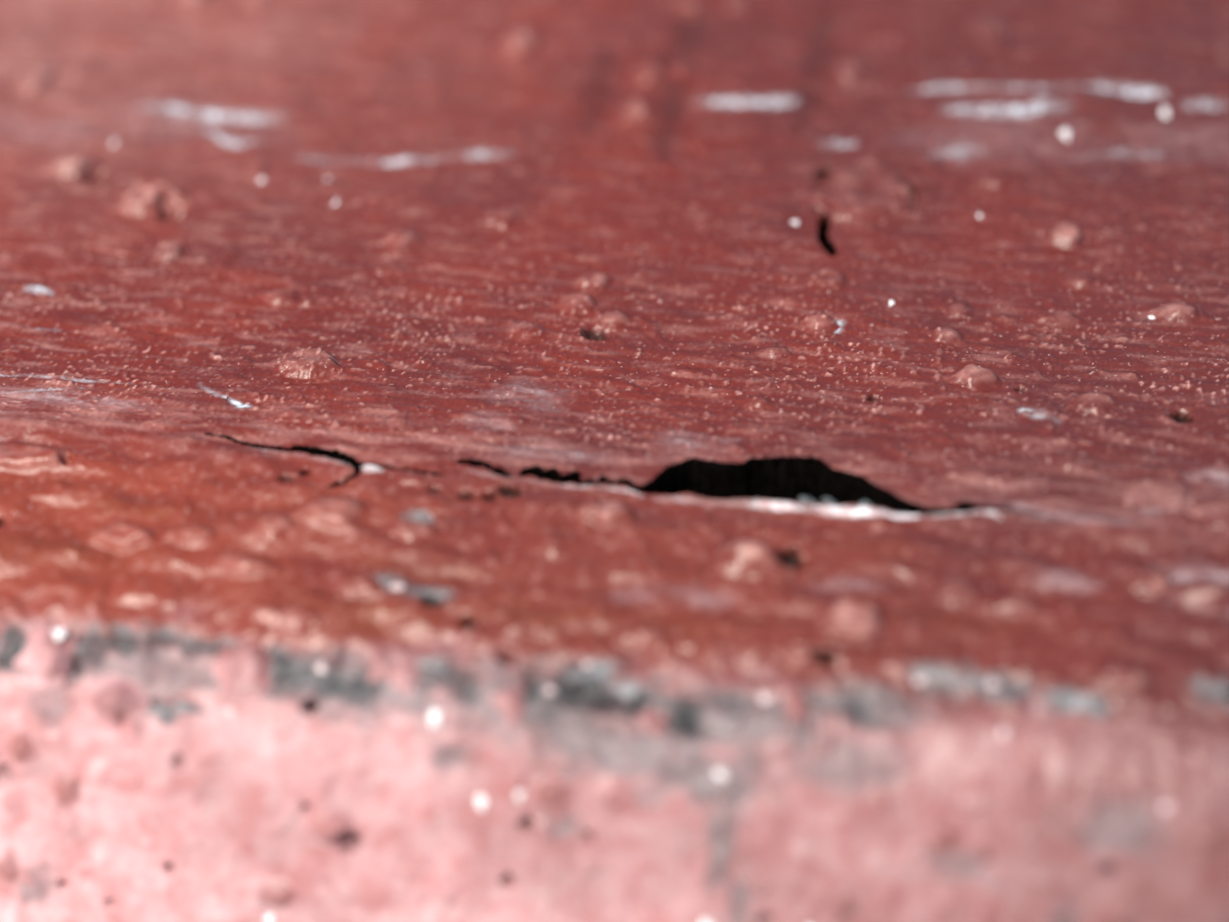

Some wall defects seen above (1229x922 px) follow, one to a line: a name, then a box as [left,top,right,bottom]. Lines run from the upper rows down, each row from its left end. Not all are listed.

crack [204,433,1058,519]